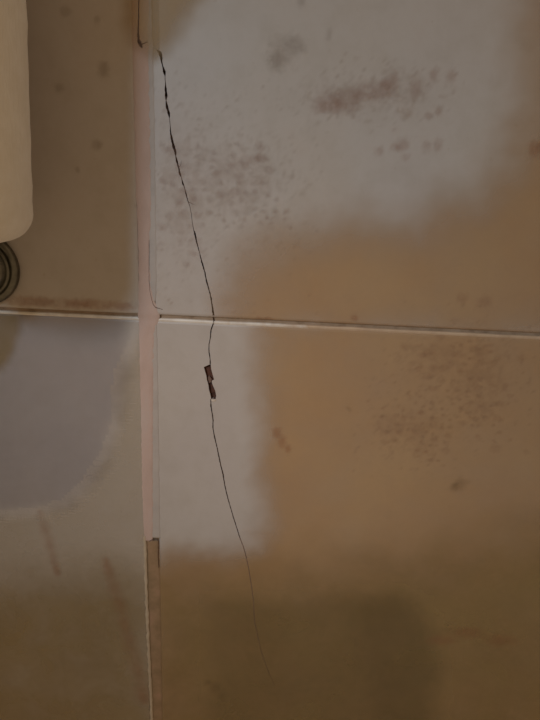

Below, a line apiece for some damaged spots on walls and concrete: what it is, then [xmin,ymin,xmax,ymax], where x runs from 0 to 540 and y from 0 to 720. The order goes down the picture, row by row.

crack [137,0,215,364]
crack [210,399,273,681]
damp [160,143,540,720]